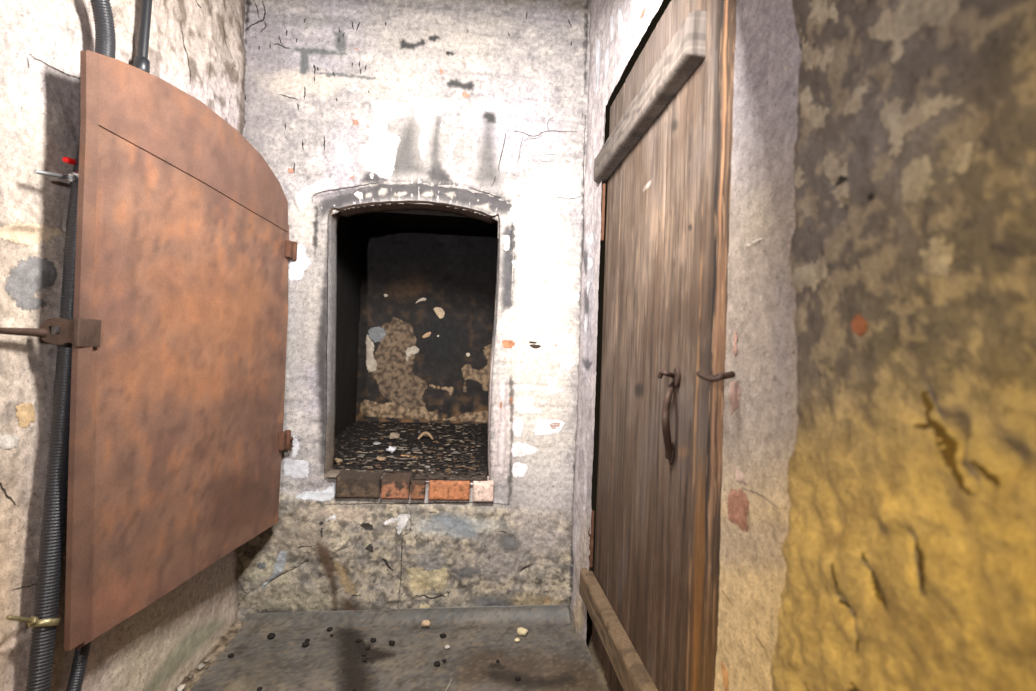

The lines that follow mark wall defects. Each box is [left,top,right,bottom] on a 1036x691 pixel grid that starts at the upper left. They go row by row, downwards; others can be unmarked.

peeling [295,175,336,210]
crack [312,182,381,201]
peeling [349,97,447,199]
water stain [480,138,496,181]
crack [469,112,586,261]
peeling [501,285,541,324]
spalling [360,317,515,475]
crack [914,391,1000,495]
crack [831,562,859,654]
crack [862,552,887,608]
water stain [361,645,392,660]